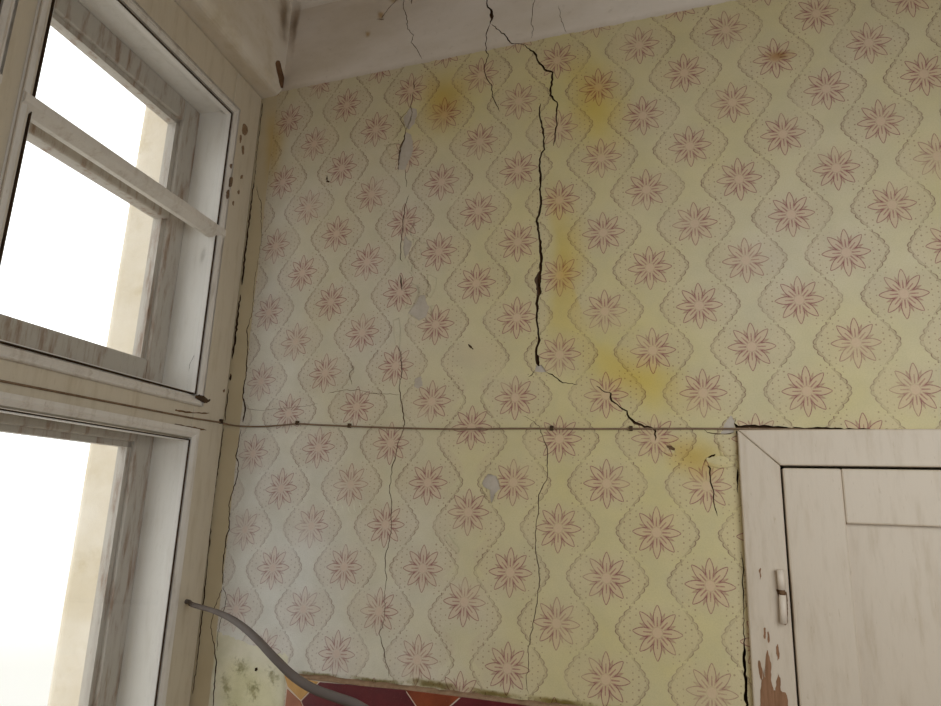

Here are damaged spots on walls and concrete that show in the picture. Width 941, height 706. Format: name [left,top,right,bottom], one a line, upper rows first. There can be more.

crack [380,0,421,57]
crack [398,83,415,289]
crack [484,0,657,440]
crack [175,103,405,706]
crack [525,416,548,691]
crack [708,466,717,514]
crack [741,558,749,706]
peeling [758,628,788,706]